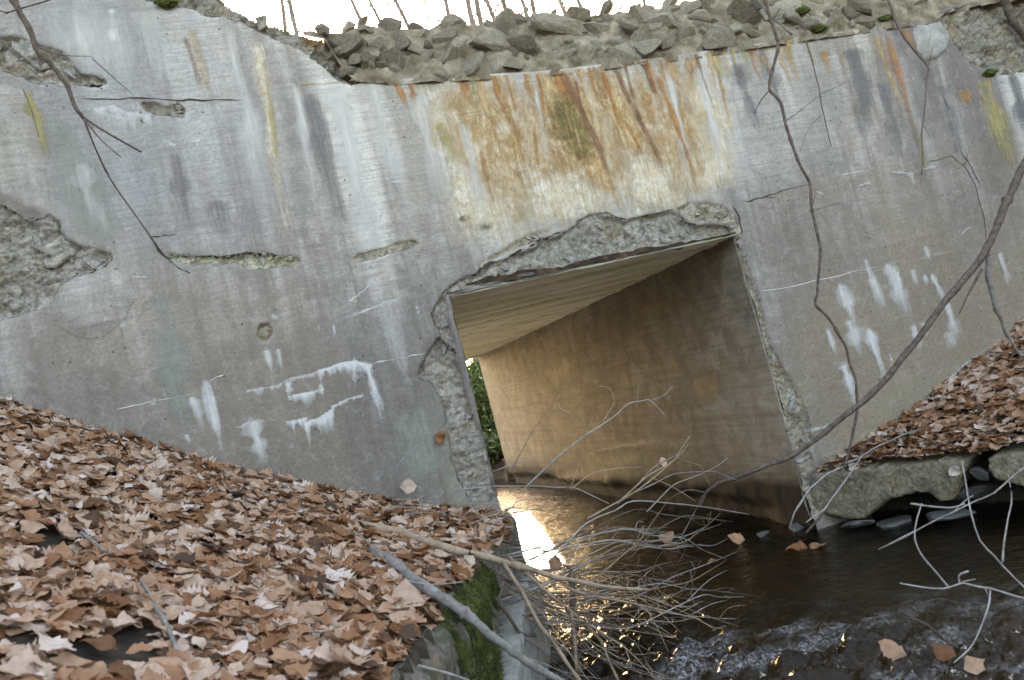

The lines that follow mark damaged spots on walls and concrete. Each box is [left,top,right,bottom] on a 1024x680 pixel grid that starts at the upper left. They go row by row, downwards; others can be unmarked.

spalling [0,35,107,88]
spalling [140,101,186,118]
corrosion [395,48,767,198]
spalling [0,205,112,321]
spalling [350,239,422,262]
damp [839,286,882,365]
damp [869,265,905,304]
damp [912,271,956,341]
damp [287,360,379,433]
spalling [418,202,820,520]
damp [842,365,853,393]
damp [248,421,263,454]